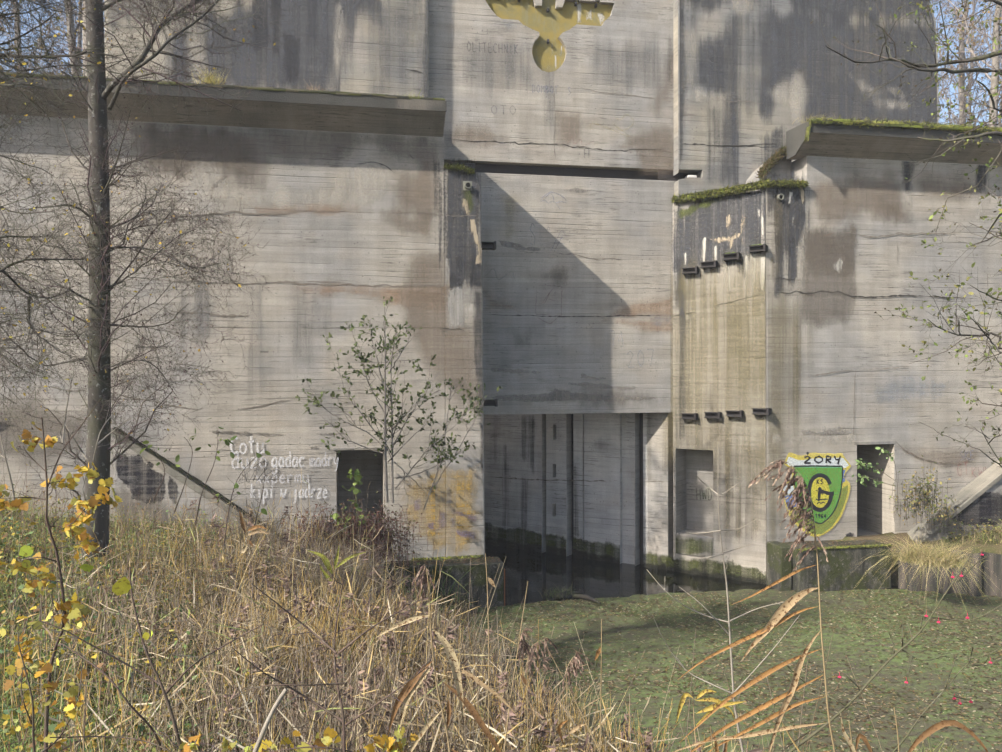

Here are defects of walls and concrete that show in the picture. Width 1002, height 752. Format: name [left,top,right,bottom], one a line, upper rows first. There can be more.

leakage [172,0,380,91]
leakage [760,0,937,124]
leakage [673,0,850,325]
crack [491,278,972,317]